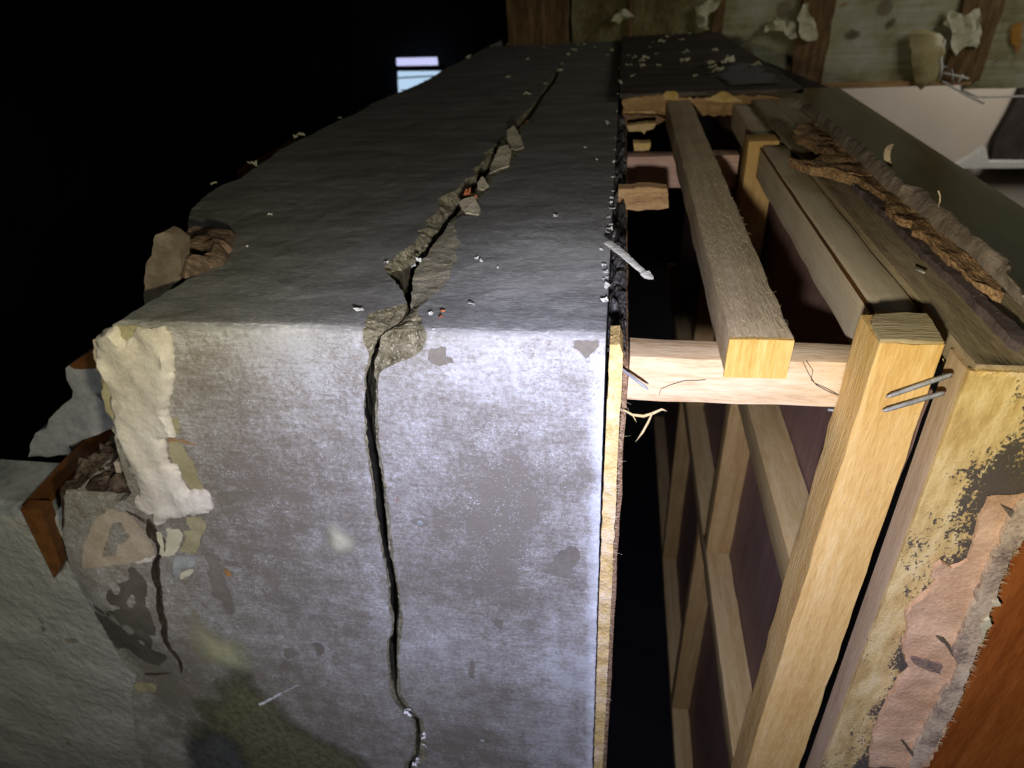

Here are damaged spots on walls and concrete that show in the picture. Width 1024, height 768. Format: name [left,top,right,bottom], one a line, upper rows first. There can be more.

crack [125,510,183,676]
flaking render [81,325,253,665]
flaking render [180,226,236,278]
crack [363,66,561,768]